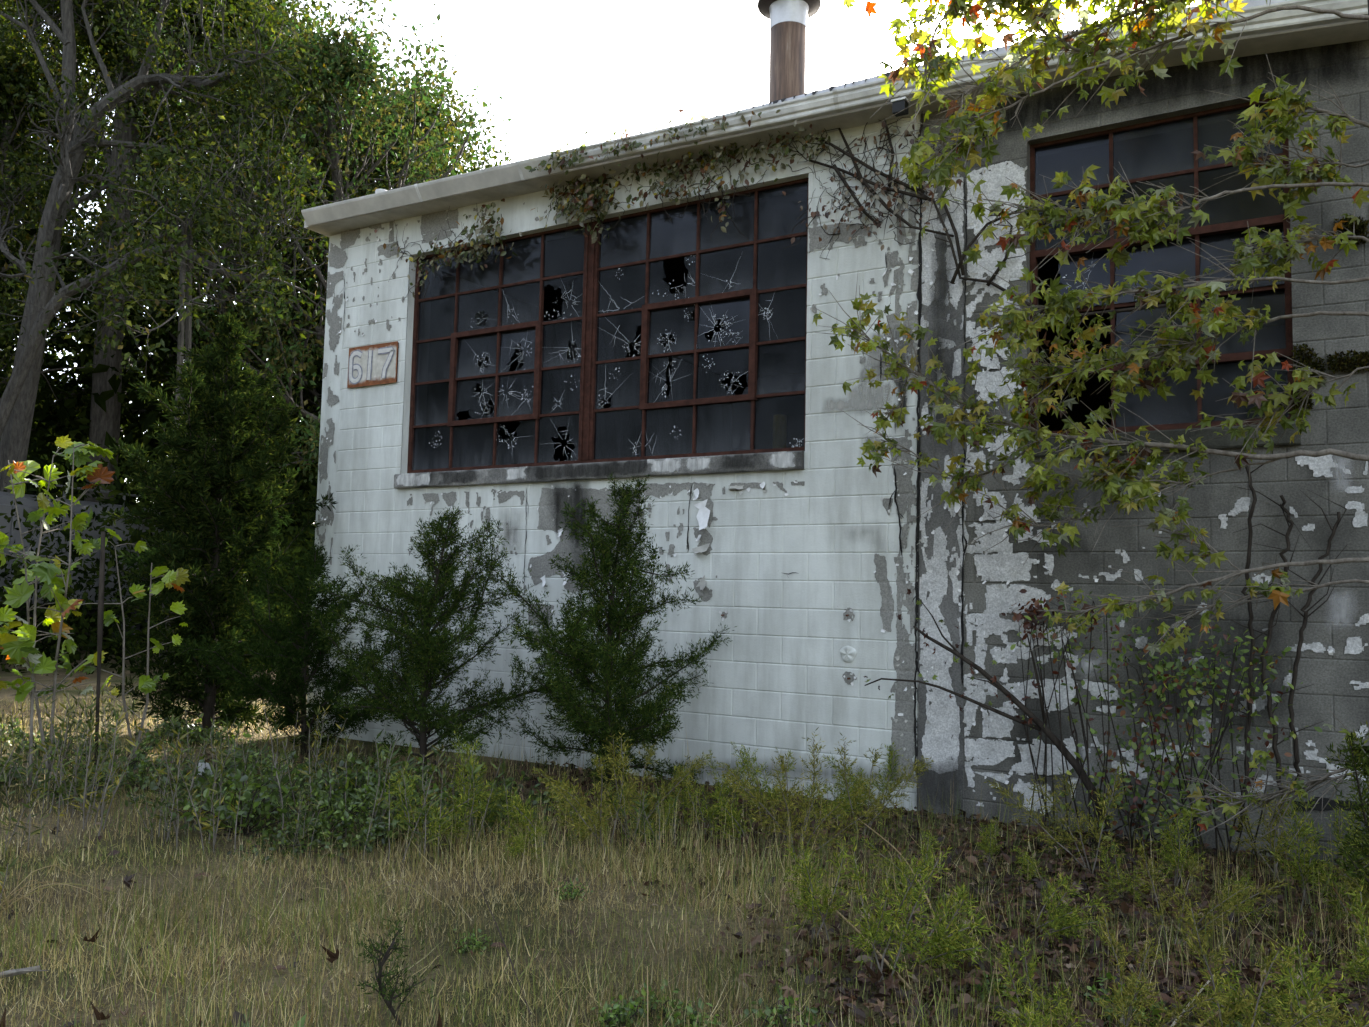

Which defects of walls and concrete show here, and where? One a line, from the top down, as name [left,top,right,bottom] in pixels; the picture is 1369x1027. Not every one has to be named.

peeling [316,204,489,565]
peeling [808,161,1292,814]
peeling [1289,506,1315,531]
peeling [1295,454,1368,527]
peeling [396,451,805,666]
peeling [1287,613,1369,655]
peeling [1350,680,1369,690]
peeling [1219,722,1369,797]